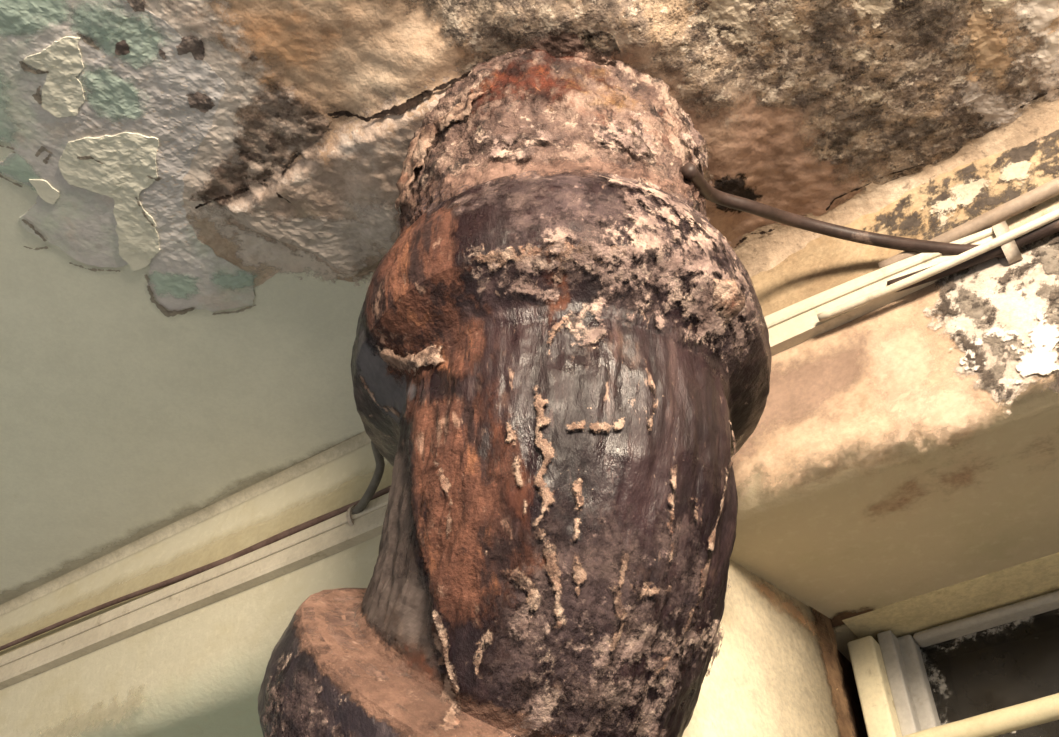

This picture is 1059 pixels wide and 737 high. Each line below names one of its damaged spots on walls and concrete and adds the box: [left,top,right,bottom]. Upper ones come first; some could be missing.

peeling [0,0,397,317]
crack [195,71,471,209]
corrosion [471,48,582,113]
spalling [466,0,692,103]
damp [209,0,1059,376]
corrosion [365,203,547,736]
damp [731,274,1004,489]
peeling [923,232,1059,413]
damp [1033,371,1057,382]